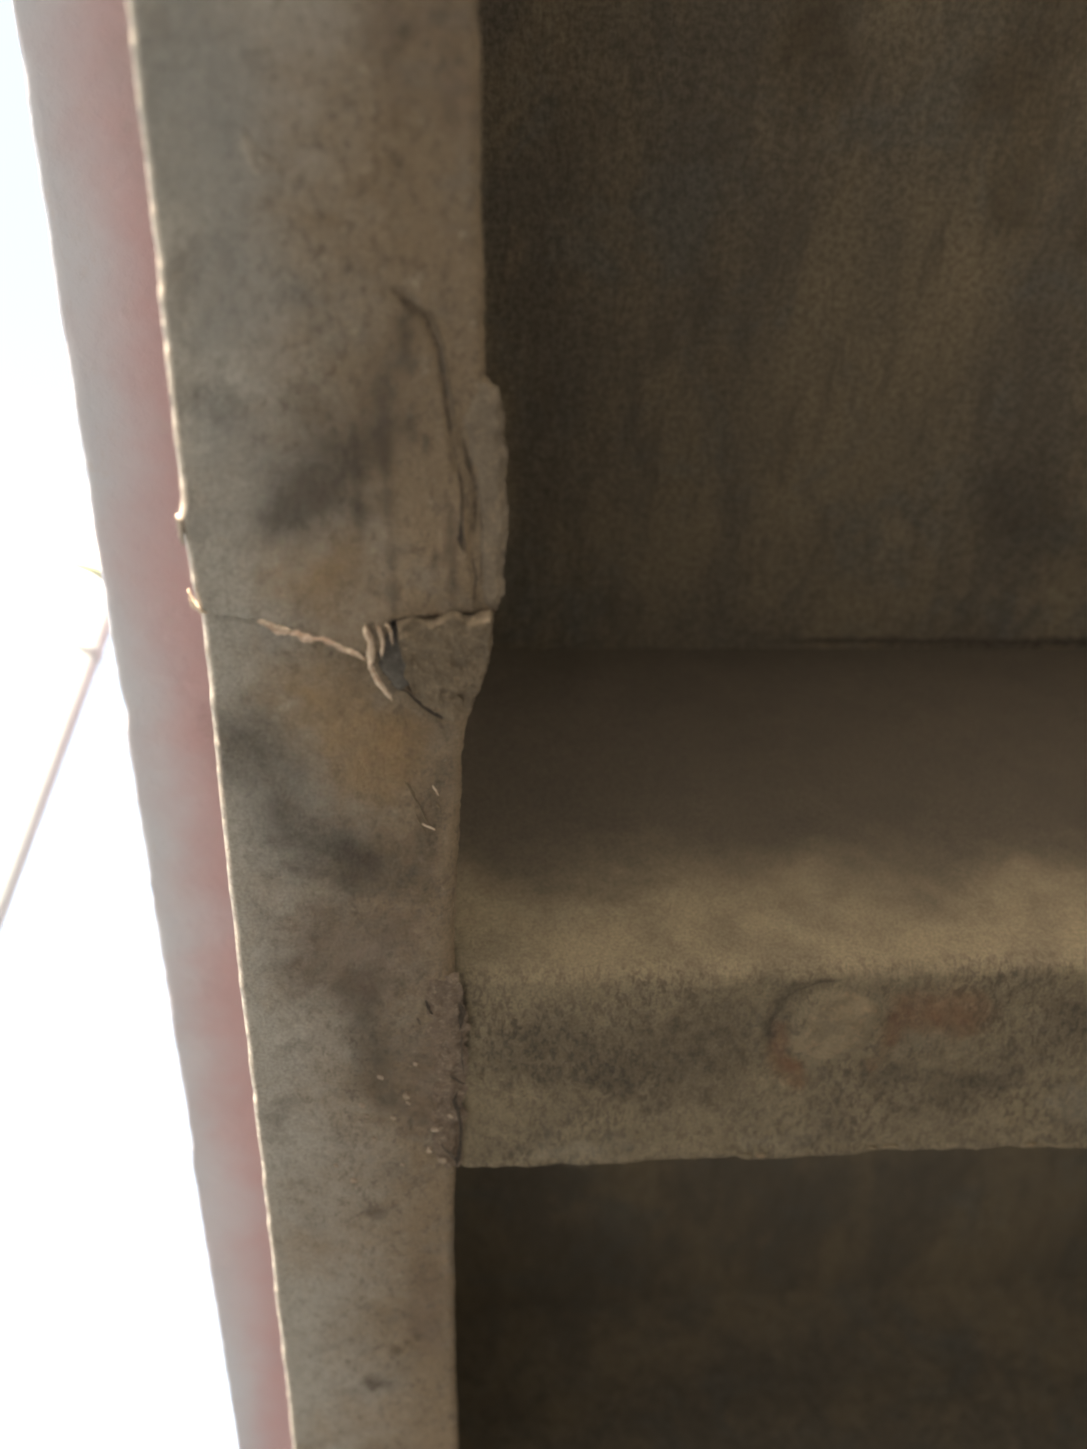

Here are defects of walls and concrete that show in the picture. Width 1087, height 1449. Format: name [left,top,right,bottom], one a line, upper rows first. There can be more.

crack [395,288,483,609]
crack [234,615,367,661]
spalling [363,609,495,741]